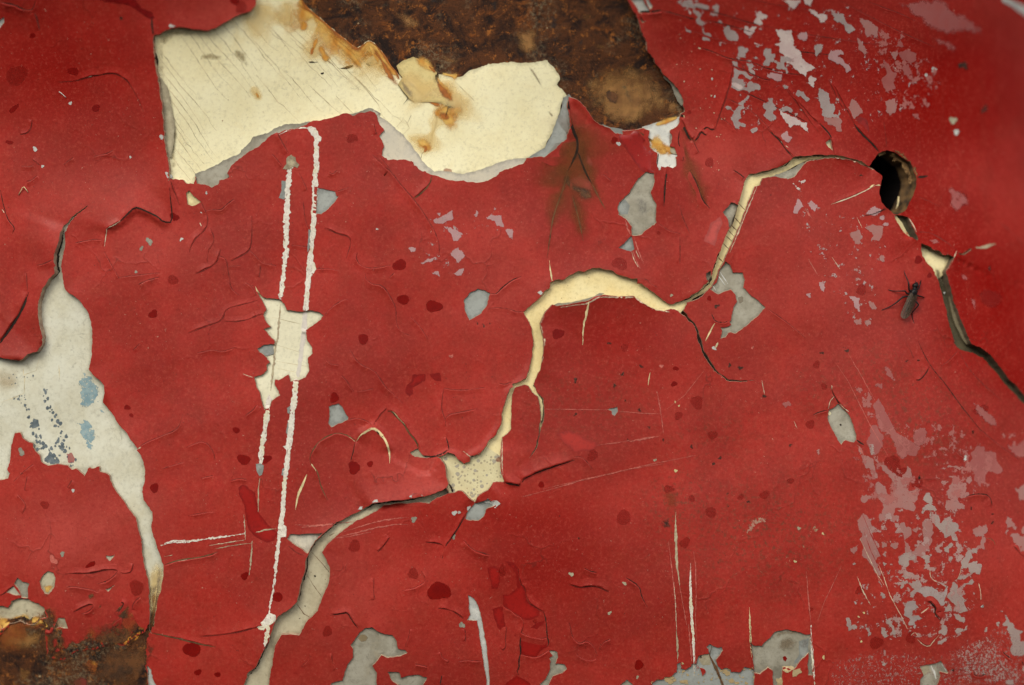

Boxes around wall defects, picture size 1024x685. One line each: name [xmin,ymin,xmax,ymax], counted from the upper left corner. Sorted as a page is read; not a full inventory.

peeling [153,0,685,251]
corrosion [303,0,684,130]
crack [547,97,611,256]
peeling [0,205,164,632]
peeling [254,289,323,410]
crack [637,278,657,292]
peeling [405,0,938,521]
crack [705,314,731,348]
crack [813,385,850,419]
crack [830,180,1024,403]
peeling [828,367,1024,685]
corrosion [0,606,154,685]